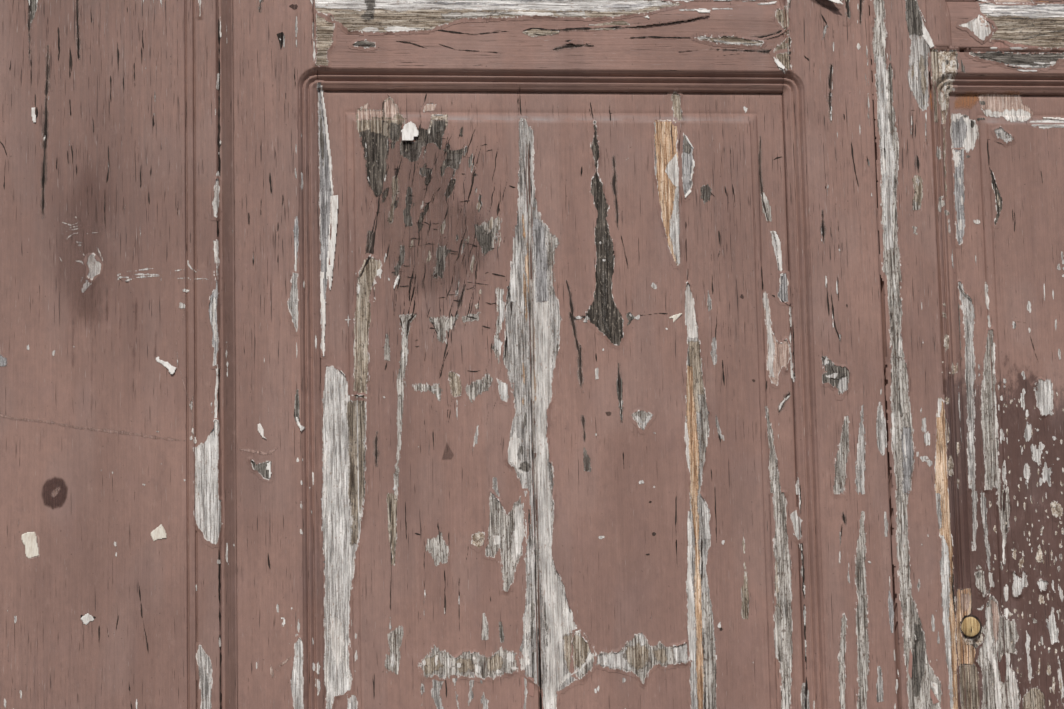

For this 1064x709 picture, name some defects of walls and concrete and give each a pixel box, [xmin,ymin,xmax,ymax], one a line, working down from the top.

peeling [184,16,235,709]
peeling [239,449,275,483]
peeling [270,0,795,709]
peeling [759,137,815,709]
peeling [818,0,1064,709]